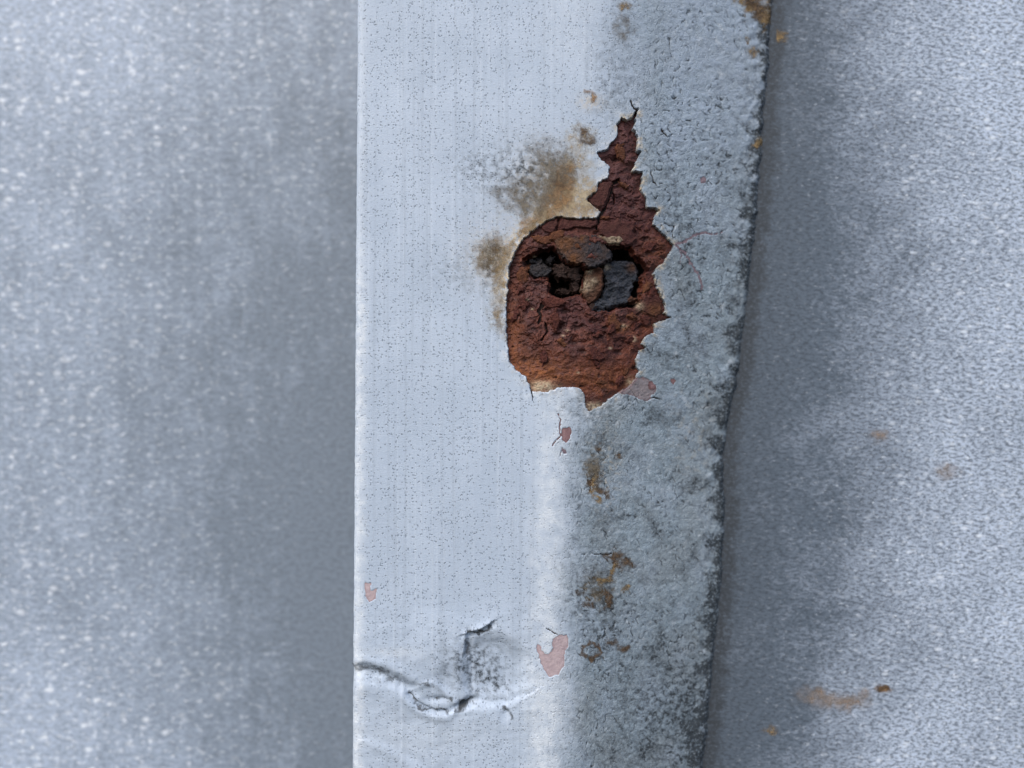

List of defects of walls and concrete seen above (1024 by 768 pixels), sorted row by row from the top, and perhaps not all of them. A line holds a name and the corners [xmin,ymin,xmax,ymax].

corrosion [480,112,672,411]
corrosion [583,448,610,503]
peeling [365,583,377,602]
corrosion [576,552,633,608]
peeling [536,628,568,677]
corrosion [579,640,630,663]